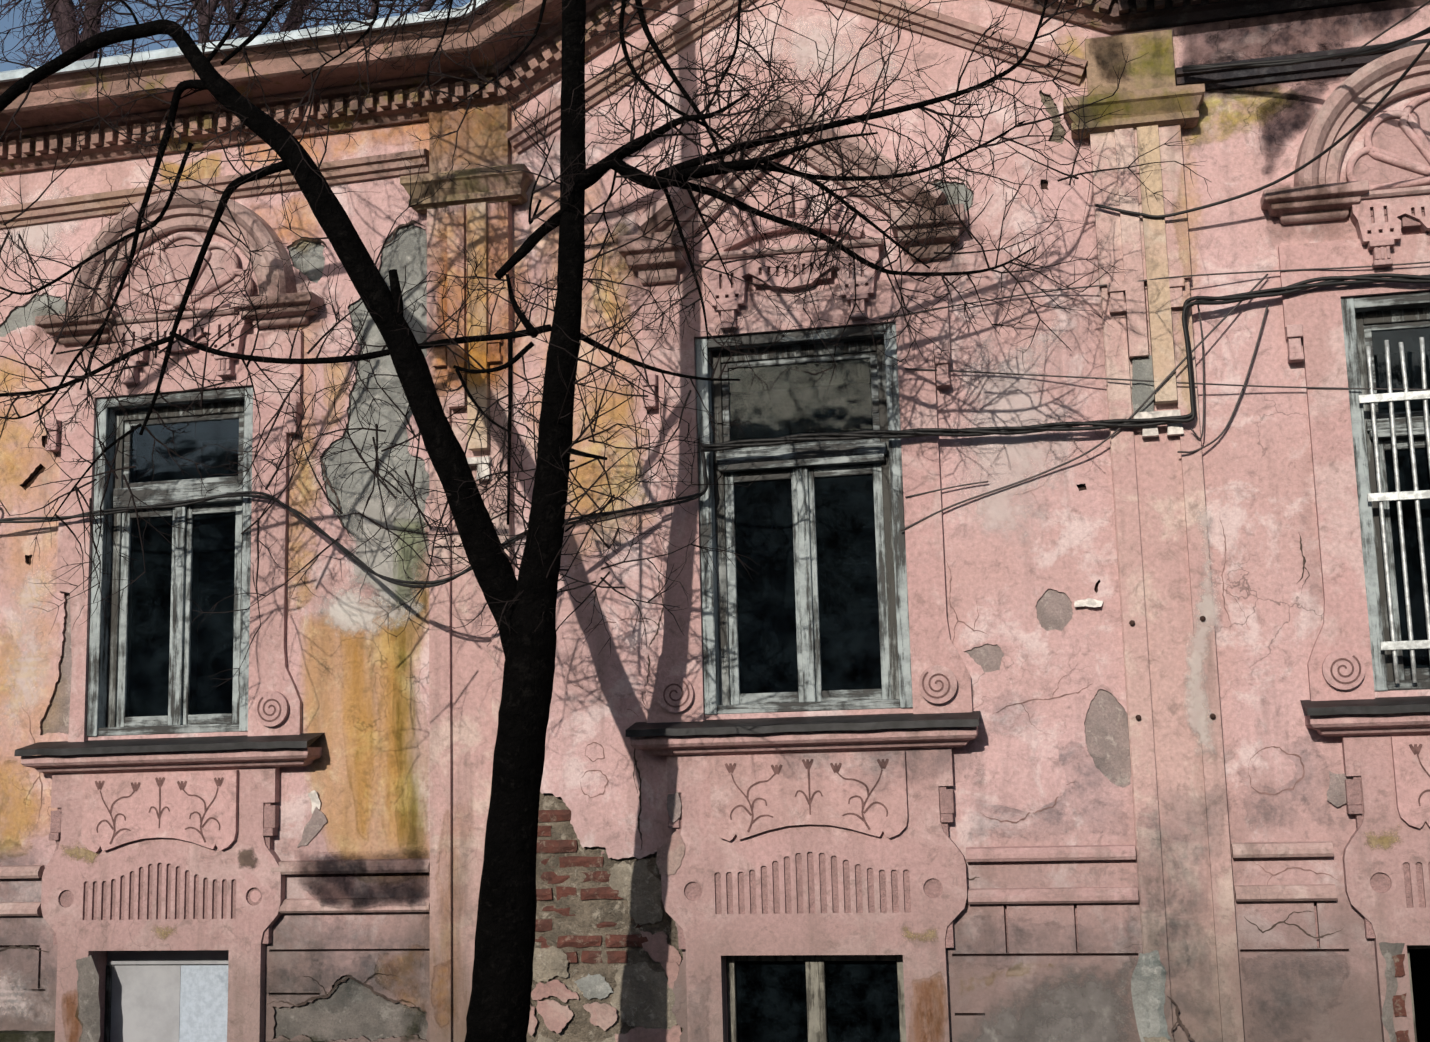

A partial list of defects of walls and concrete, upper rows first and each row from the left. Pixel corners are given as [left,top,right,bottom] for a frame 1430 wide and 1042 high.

flaking render [379,224,427,357]
flaking render [321,299,429,540]
water stain [322,494,429,631]
flaking render [1036,580,1103,631]
crack [1220,520,1250,634]
crack [1296,534,1310,592]
flaking render [40,592,72,735]
crack [580,742,642,849]
crack [993,662,1093,735]
flaking render [1084,689,1131,788]
flaking render [527,792,685,1042]
crack [1245,911,1341,938]